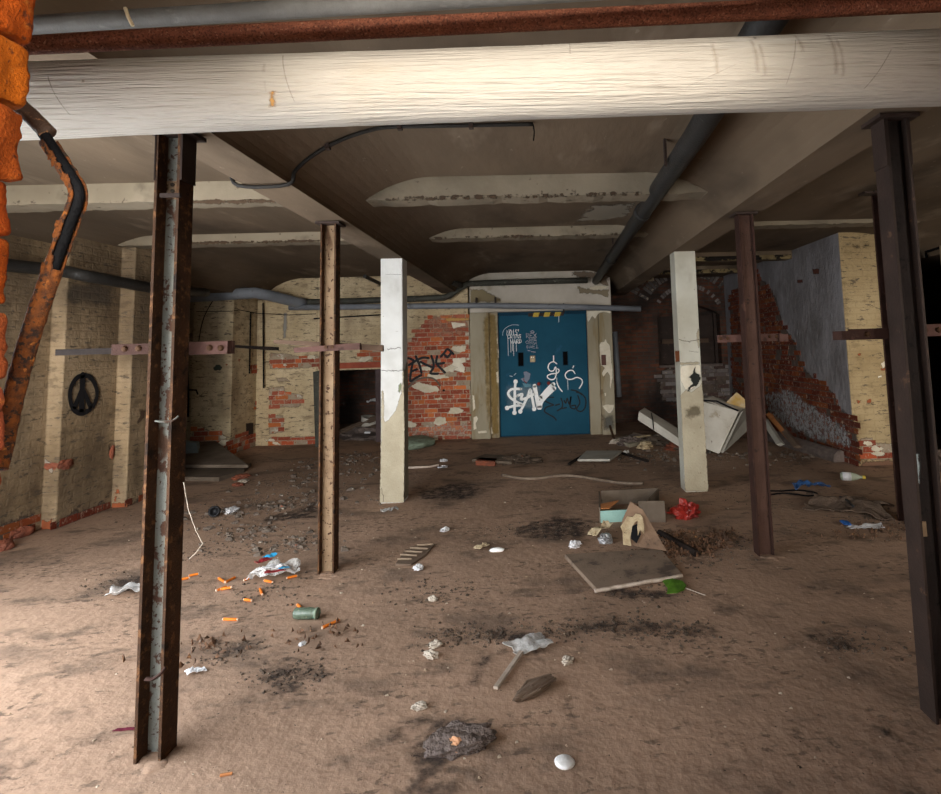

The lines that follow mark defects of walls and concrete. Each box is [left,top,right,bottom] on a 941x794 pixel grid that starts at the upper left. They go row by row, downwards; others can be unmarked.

rust [47,150,71,194]
rust [40,255,54,275]
flaking render [357,350,381,362]
flaking render [380,314,493,503]
peeling [599,339,614,413]
peeling [654,288,745,491]
flaking render [756,254,892,467]